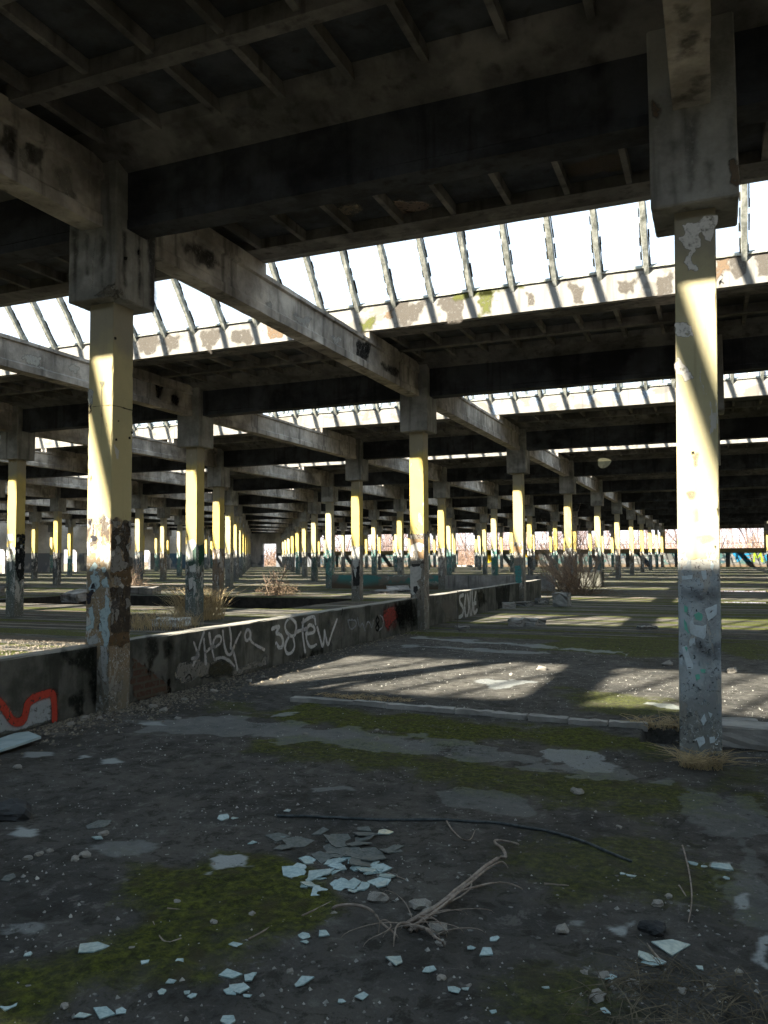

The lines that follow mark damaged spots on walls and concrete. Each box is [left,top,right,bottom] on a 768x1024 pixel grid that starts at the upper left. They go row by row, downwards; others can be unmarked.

damp [0,126,43,168]
peeling [679,215,718,271]
damp [185,244,220,268]
peeling [674,322,693,337]
peeling [675,358,693,381]
peeling [24,519,267,701]
spalling [204,597,352,609]